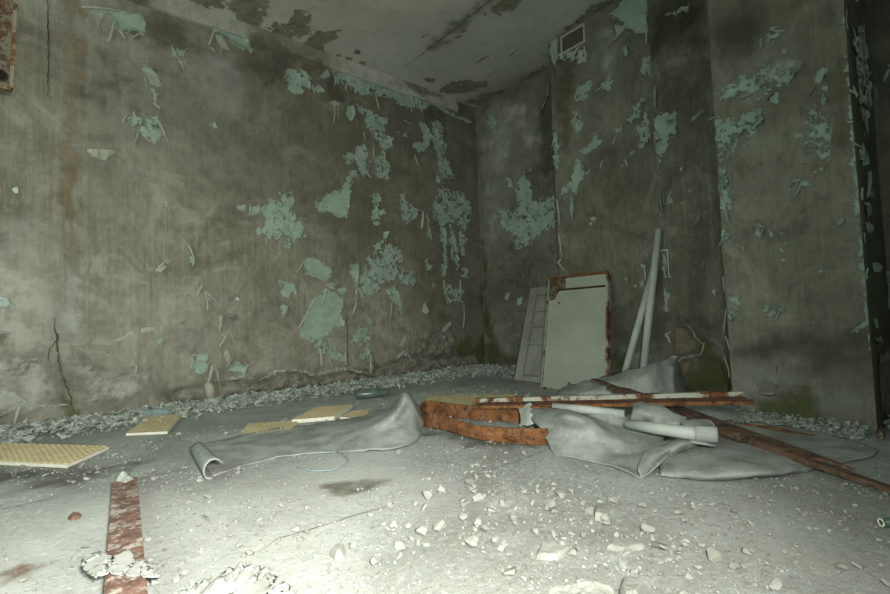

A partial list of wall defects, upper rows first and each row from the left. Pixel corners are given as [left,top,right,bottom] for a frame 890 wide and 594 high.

crack [44,0,52,91]
peeling [81,6,147,43]
peeling [208,27,253,56]
peeling [189,0,342,51]
peeling [424,0,678,271]
peeling [789,66,833,198]
peeling [842,0,890,350]
peeling [691,64,797,378]
crack [48,319,73,410]